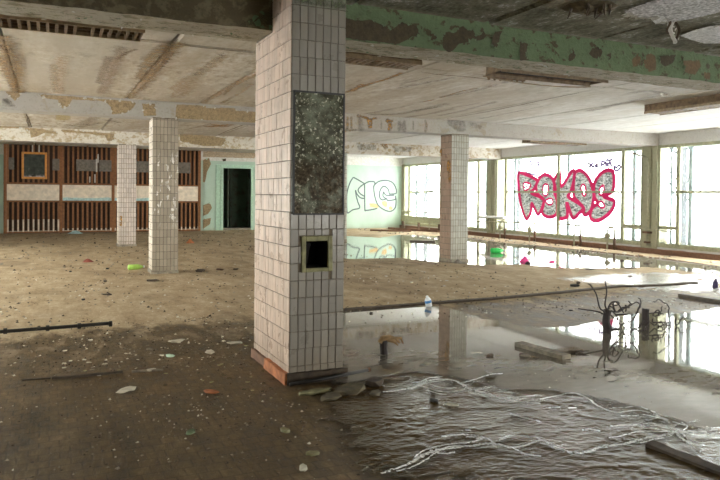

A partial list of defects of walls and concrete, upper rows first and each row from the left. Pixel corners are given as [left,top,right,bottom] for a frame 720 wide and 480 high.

leakage [0,35,25,93]
leakage [126,42,183,98]
peeling [427,26,502,61]
peeling [489,41,694,89]
peeling [562,0,720,44]
peeling [0,126,115,141]
peeling [41,94,157,116]
peeling [175,104,256,123]